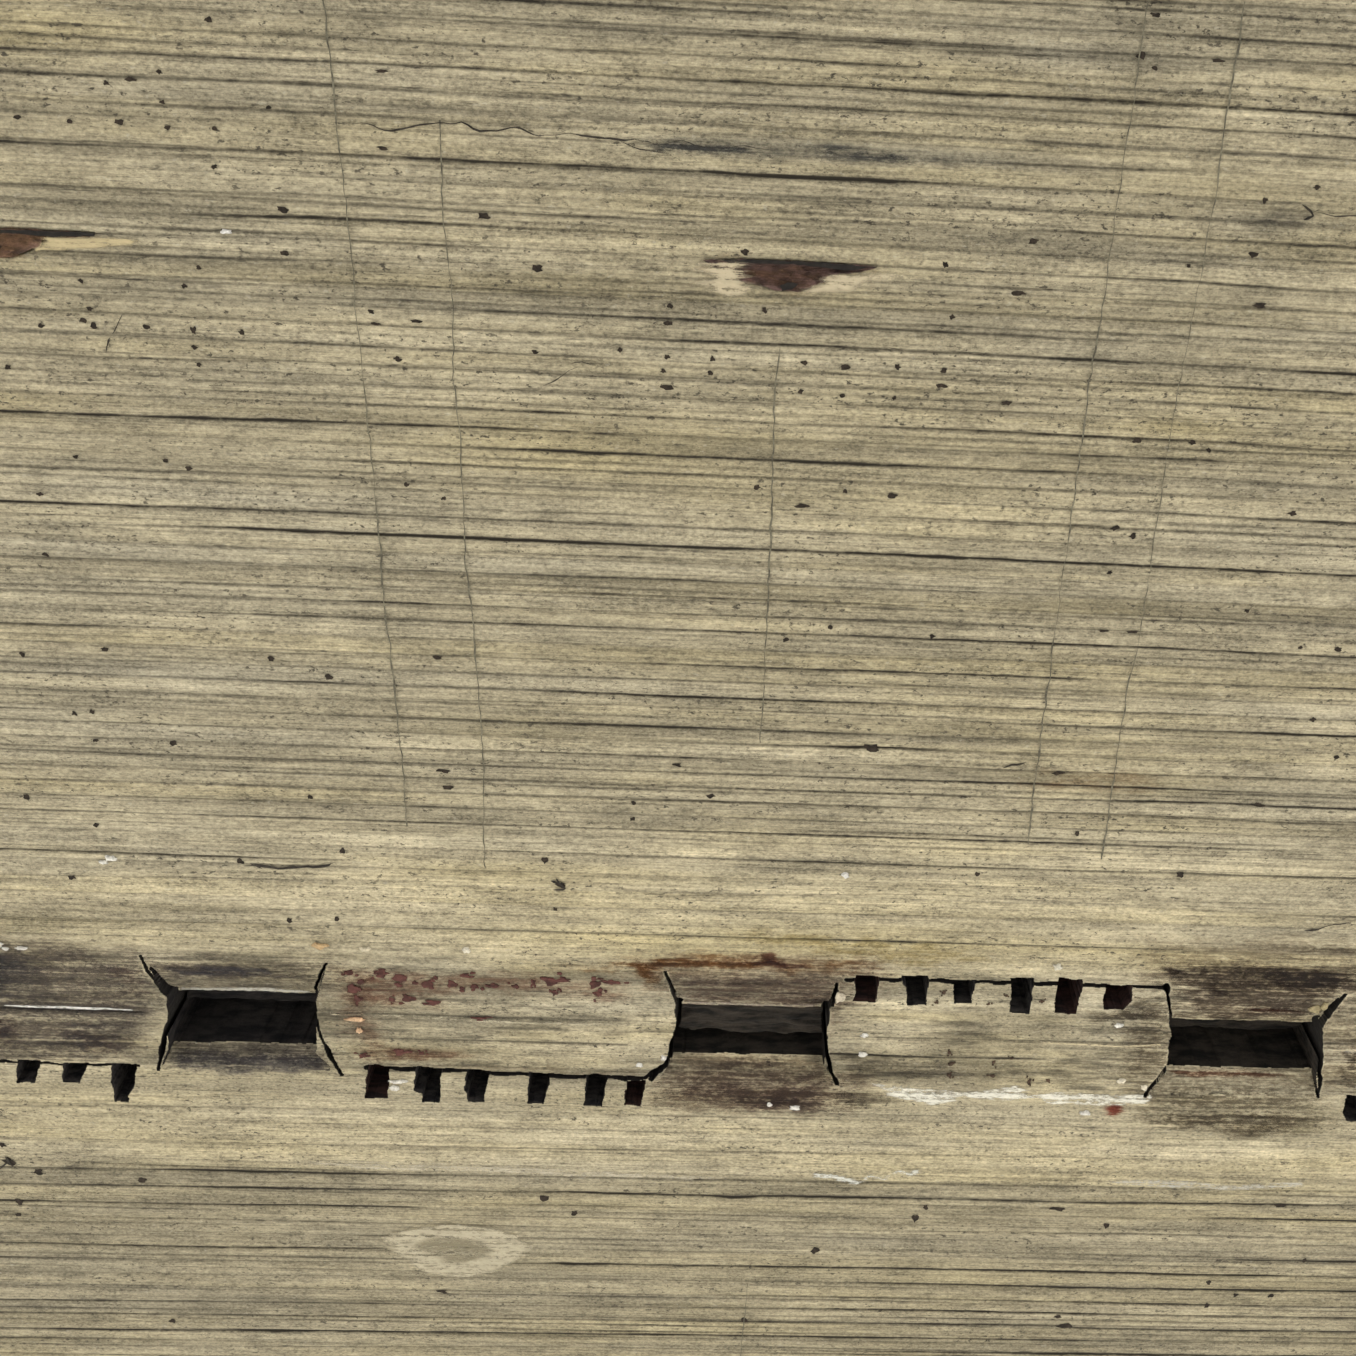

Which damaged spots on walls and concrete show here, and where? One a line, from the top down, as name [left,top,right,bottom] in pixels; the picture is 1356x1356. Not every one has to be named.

spalling [149,942,329,1069]
corrosion [341,954,802,1006]
spalling [660,984,846,1085]
spalling [1116,983,1329,1098]
leakage [873,1084,1151,1106]